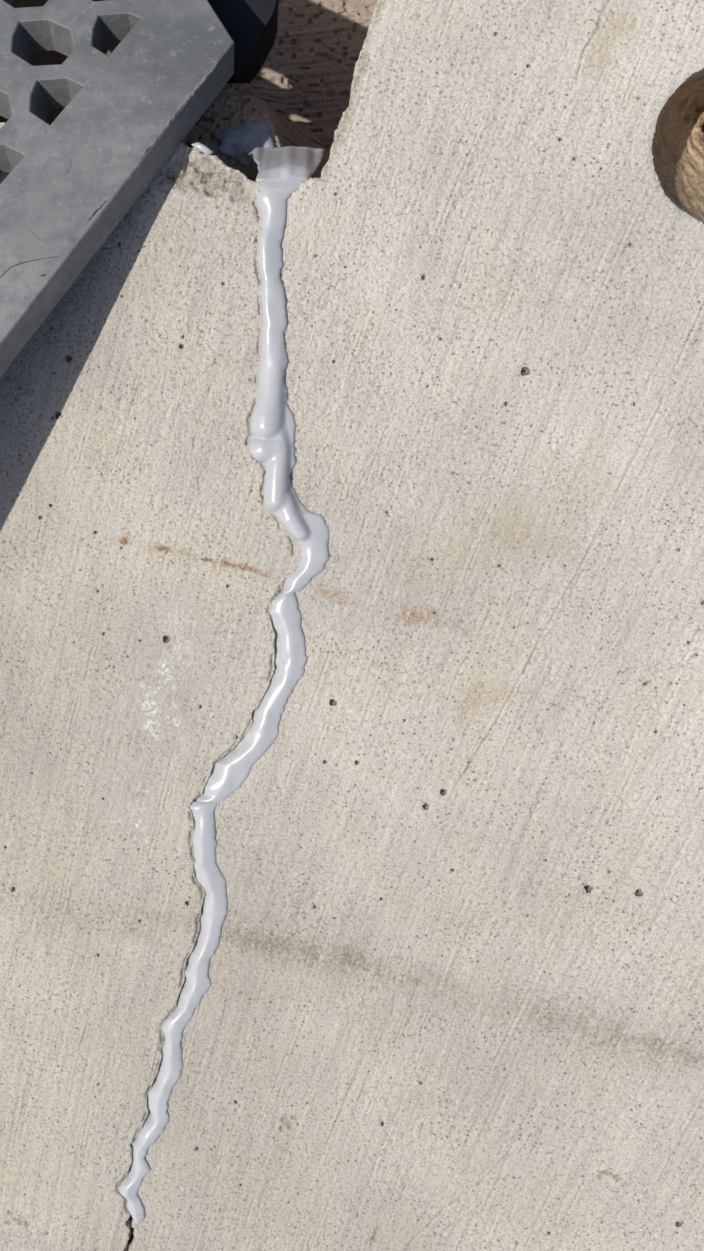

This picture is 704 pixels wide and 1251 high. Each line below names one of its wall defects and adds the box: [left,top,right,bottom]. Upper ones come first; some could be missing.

crack [127,1216,135,1251]